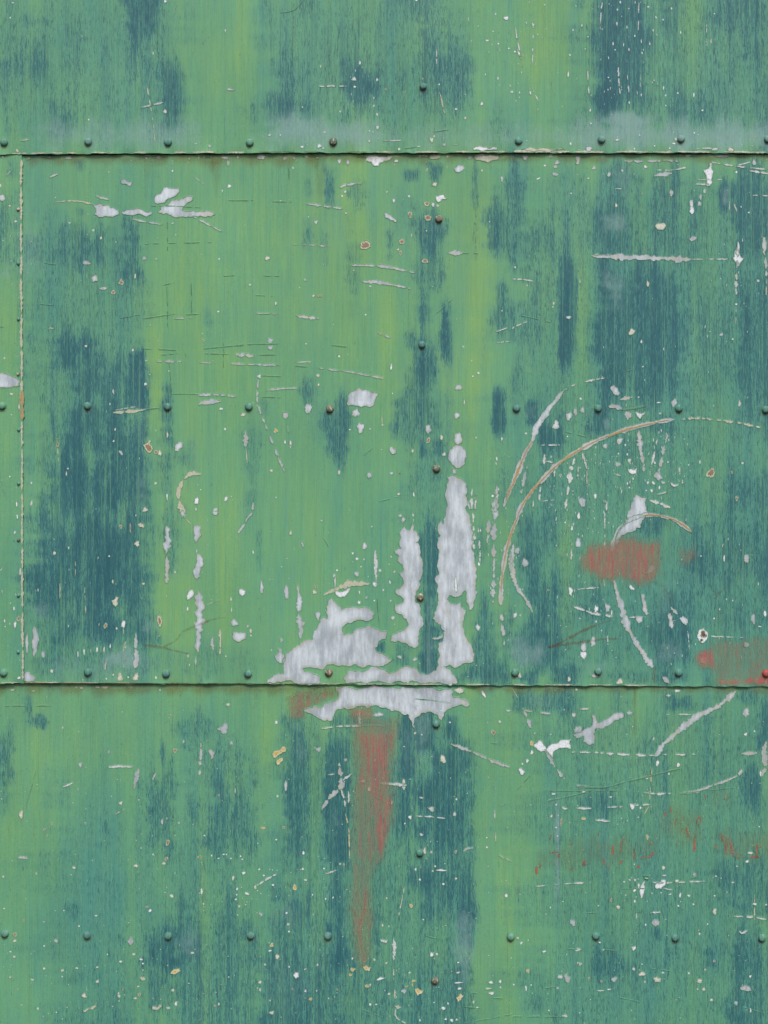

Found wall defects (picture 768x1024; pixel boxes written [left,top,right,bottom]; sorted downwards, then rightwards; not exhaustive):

peeling [56,186,222,244]
peeling [0,372,21,410]
peeling [316,362,393,434]
peeling [266,377,754,730]
peeling [440,707,744,814]